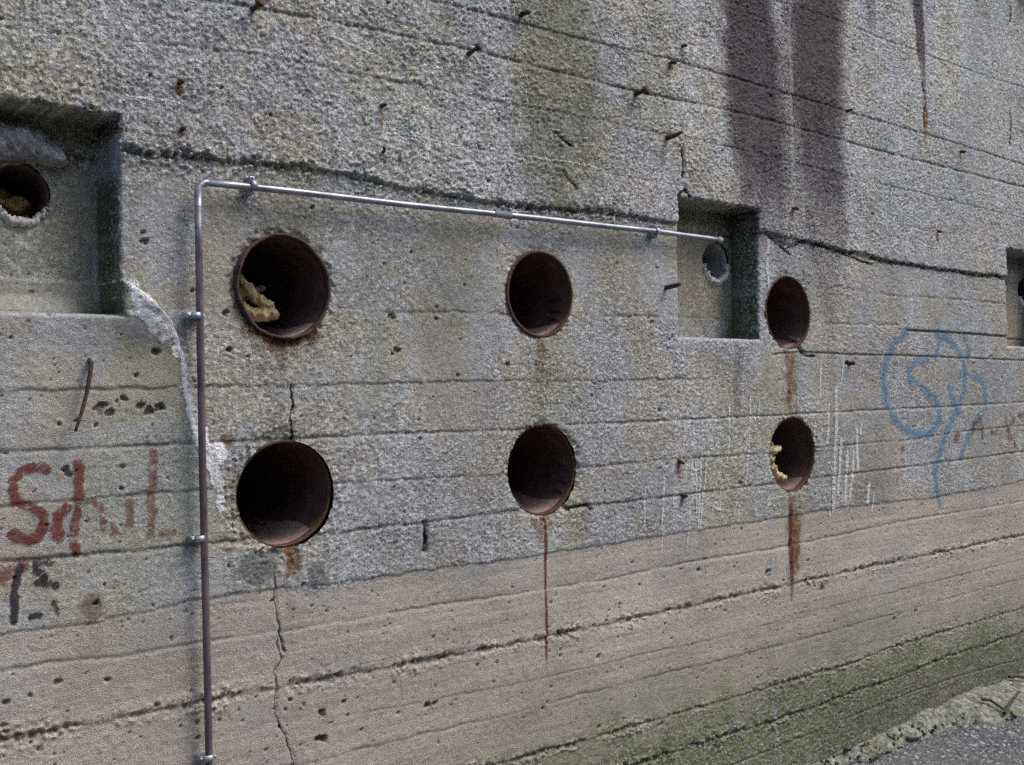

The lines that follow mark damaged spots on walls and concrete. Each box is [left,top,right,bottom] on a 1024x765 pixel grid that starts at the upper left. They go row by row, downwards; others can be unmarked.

crack [763,227,1004,280]
crack [273,567,295,765]